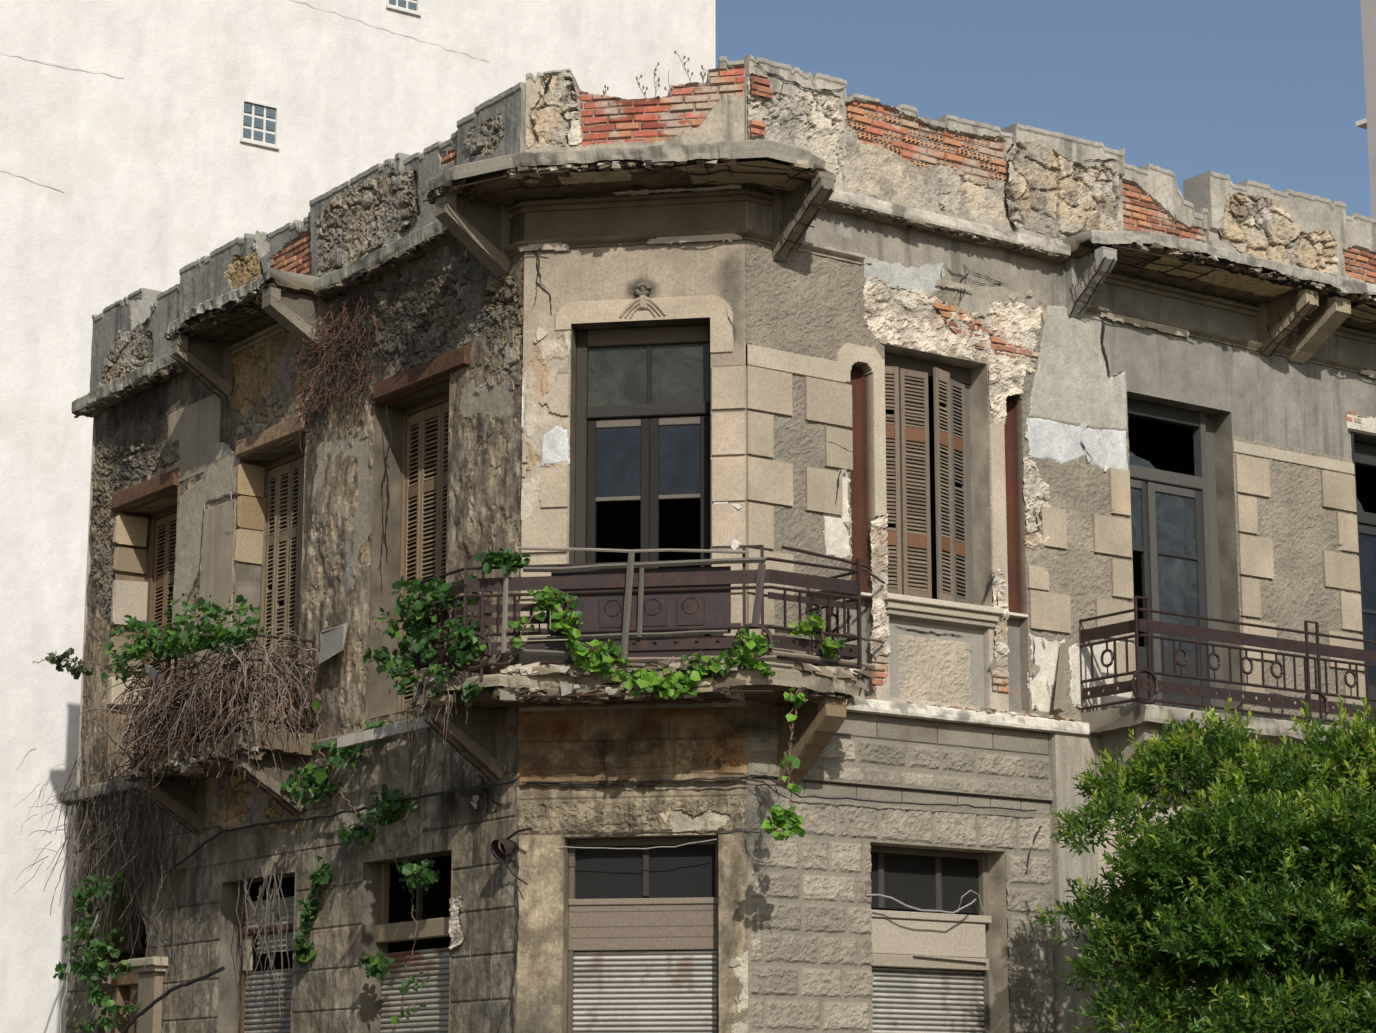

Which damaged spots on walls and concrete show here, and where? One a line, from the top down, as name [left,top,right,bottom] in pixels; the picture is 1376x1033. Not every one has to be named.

crack [532,250,552,315]
flaking render [74,66,1376,625]
crack [1101,317,1121,377]